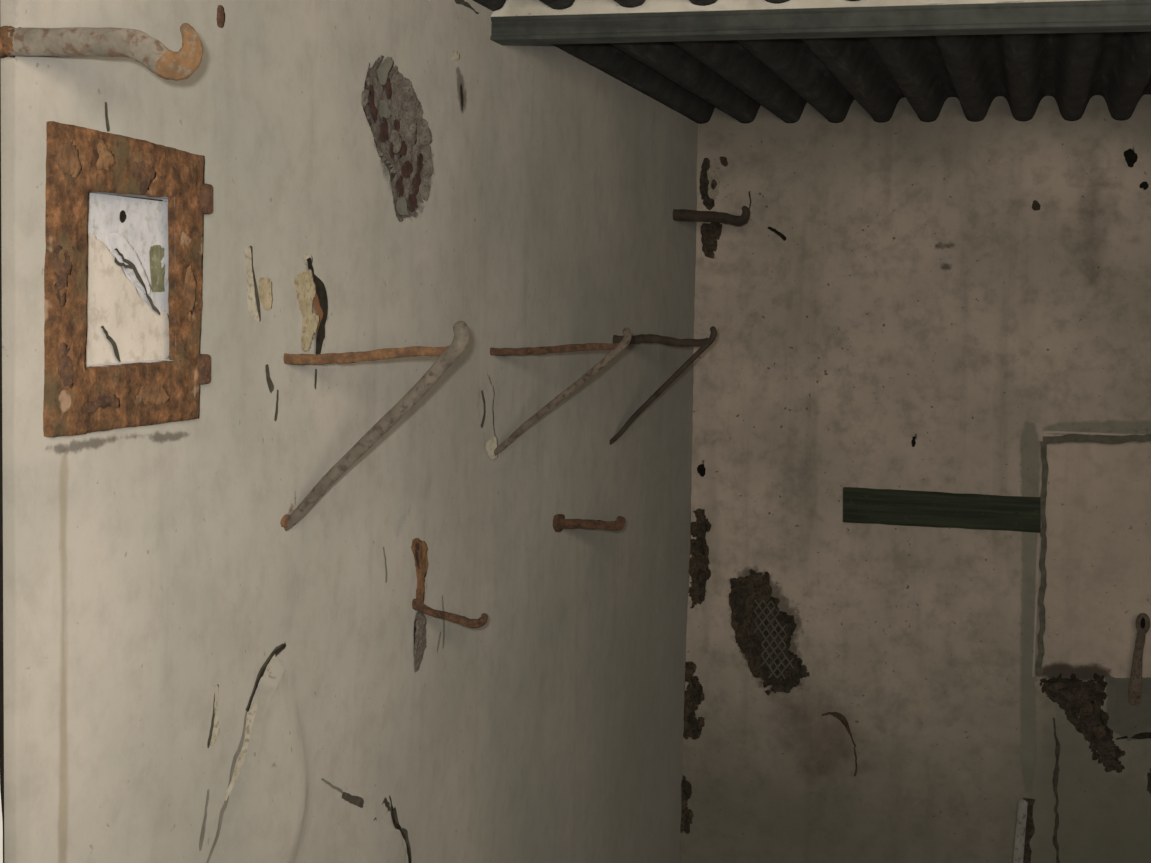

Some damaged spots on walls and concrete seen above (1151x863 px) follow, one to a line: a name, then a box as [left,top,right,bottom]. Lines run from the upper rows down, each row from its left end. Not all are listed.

spalling [362,55,434,222]
spalling [699,156,728,259]
peeling [245,245,328,354]
peeling [265,364,279,421]
spalling [688,508,711,609]
spalling [729,569,810,696]
crack [199,642,286,863]
spalling [683,661,705,739]
spalling [1040,676,1125,773]
crack [321,778,412,863]